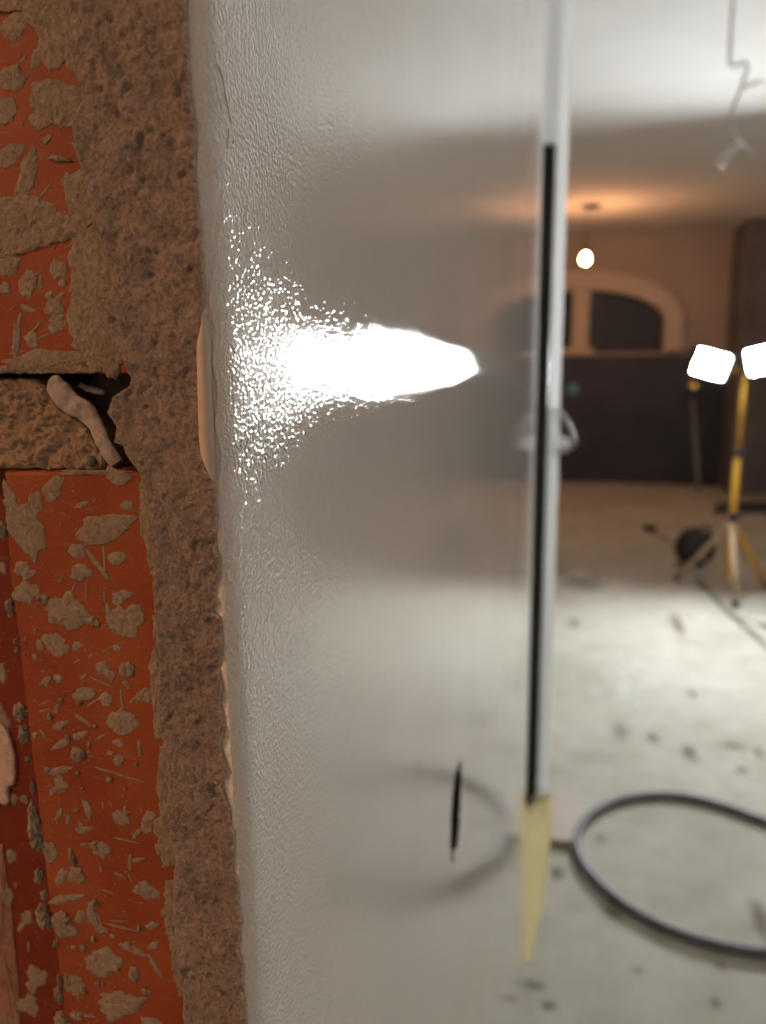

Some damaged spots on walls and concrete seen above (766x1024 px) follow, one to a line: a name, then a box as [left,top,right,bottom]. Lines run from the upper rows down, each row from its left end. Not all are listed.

spalling [64,0,248,1024]